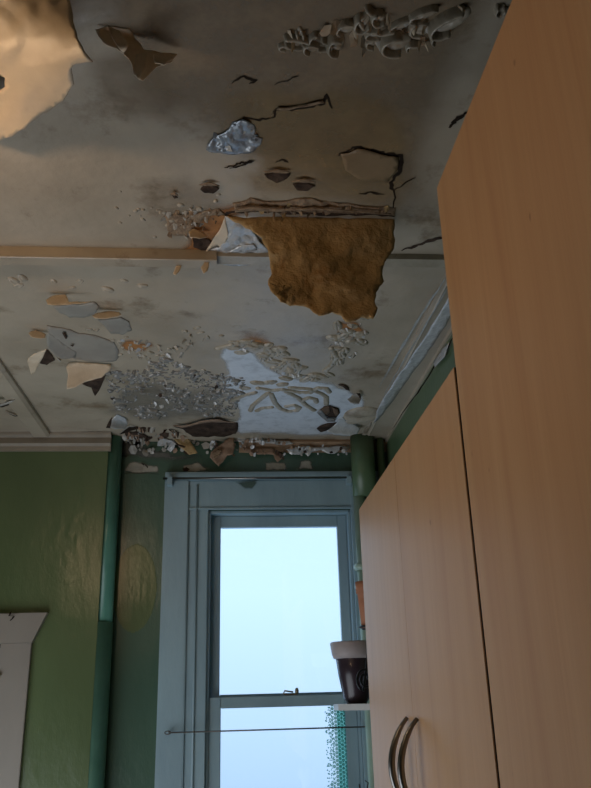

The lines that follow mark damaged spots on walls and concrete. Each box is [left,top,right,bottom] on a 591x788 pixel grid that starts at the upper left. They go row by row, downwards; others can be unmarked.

peeling [0,0,93,141]
peeling [96,25,177,81]
crack [231,75,298,85]
crack [243,93,332,121]
peeling [165,169,396,366]
peeling [106,339,363,474]
peeling [374,298,450,423]